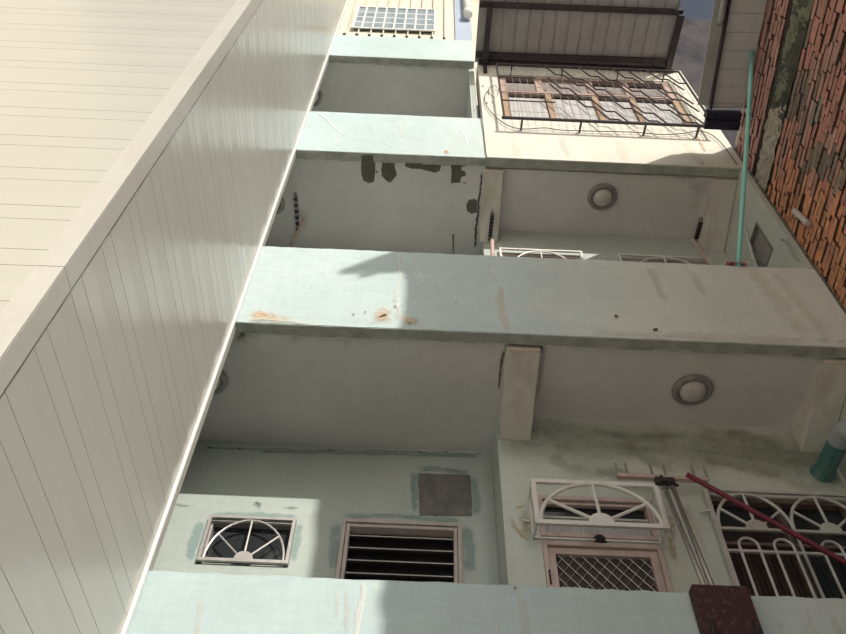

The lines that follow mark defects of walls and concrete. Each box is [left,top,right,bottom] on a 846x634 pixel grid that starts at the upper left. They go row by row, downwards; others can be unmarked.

peeling [361,155,397,183]
peeling [405,163,466,184]
crack [460,68,487,246]
crack [355,586,366,634]